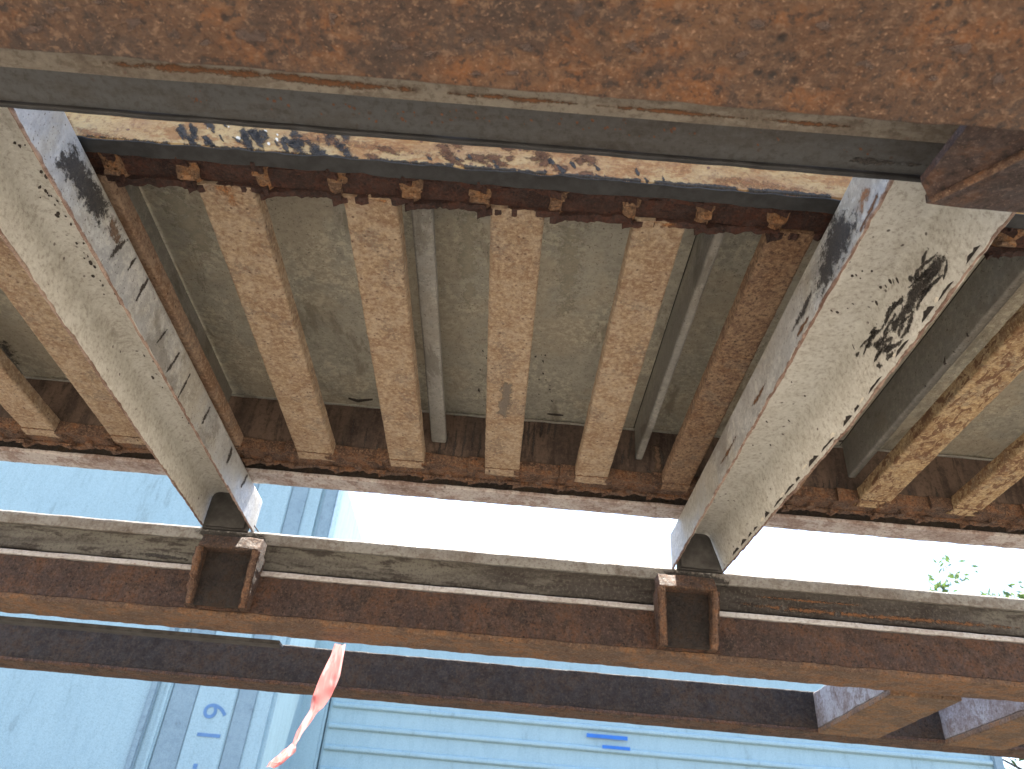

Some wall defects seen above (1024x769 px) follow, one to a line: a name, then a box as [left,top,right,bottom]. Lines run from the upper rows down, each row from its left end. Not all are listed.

corrosion [103,62,415,92]
corrosion [447,92,577,105]
peeling [176,122,400,160]
corrosion [576,105,747,137]
corrosion [757,119,850,146]
peeling [426,144,606,177]
corrosion [860,188,878,232]
corrosion [922,282,953,322]
corrosion [497,380,514,417]
corrosion [733,476,800,555]